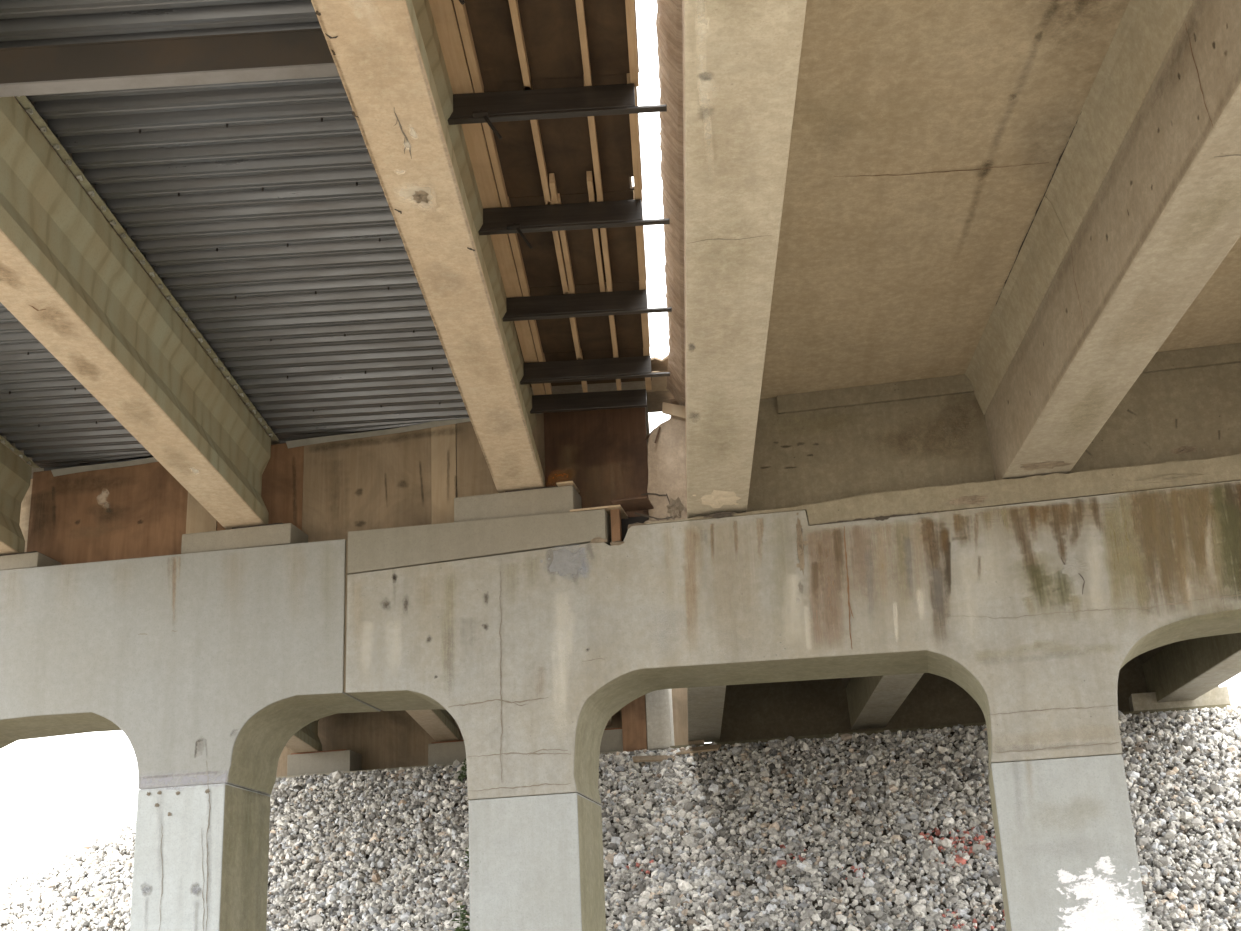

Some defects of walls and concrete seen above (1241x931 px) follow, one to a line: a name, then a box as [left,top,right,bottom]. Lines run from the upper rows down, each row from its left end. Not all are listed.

rust [1003,498,1122,596]
crack [448,571,571,791]
crack [157,835,165,930]
crack [201,761,211,931]